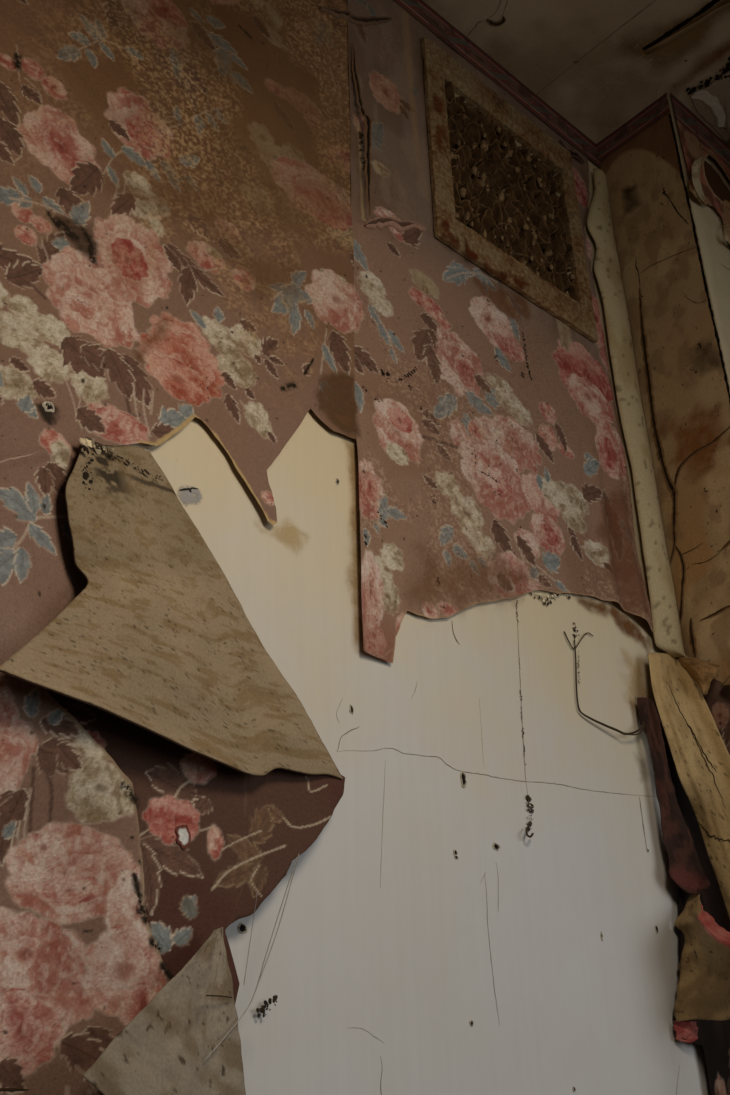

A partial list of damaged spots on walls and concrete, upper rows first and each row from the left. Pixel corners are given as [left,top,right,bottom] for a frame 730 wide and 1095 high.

crack [635,185,730,656]
peeling [0,430,345,1095]
crack [336,701,656,797]
peeling [637,653,730,1043]